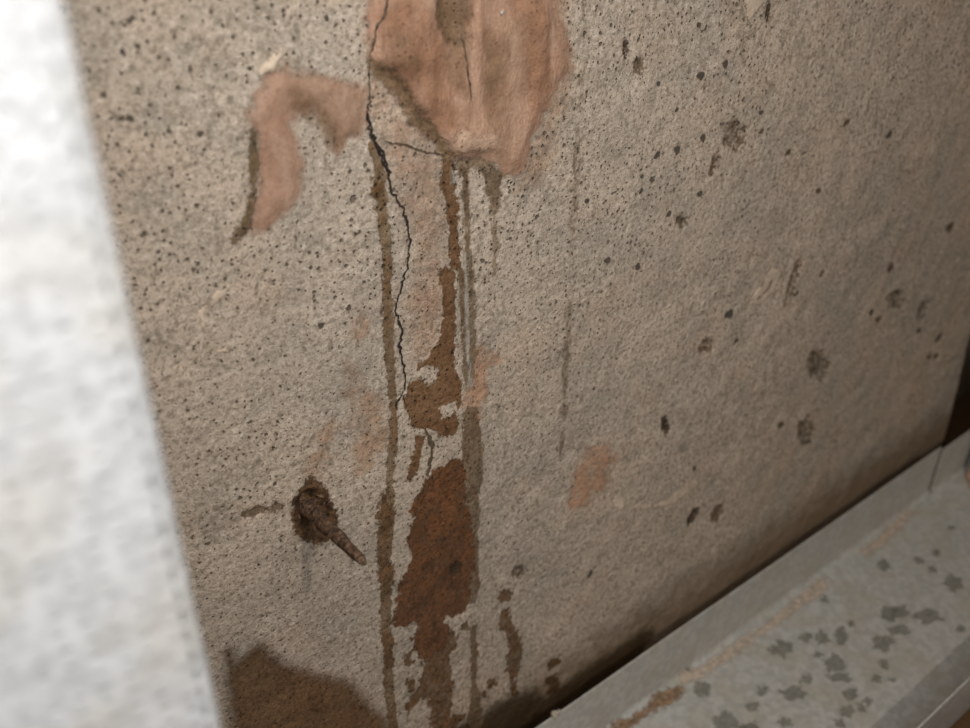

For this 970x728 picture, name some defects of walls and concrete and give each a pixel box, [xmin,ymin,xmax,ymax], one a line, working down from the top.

crack [366,0,412,408]
water stain [228,0,502,728]
crack [424,428,435,476]
corrosion [290,475,339,545]
corrosion [390,458,476,728]
corrosion [481,589,524,698]
corrosion [545,655,562,695]
water stain [455,625,652,728]